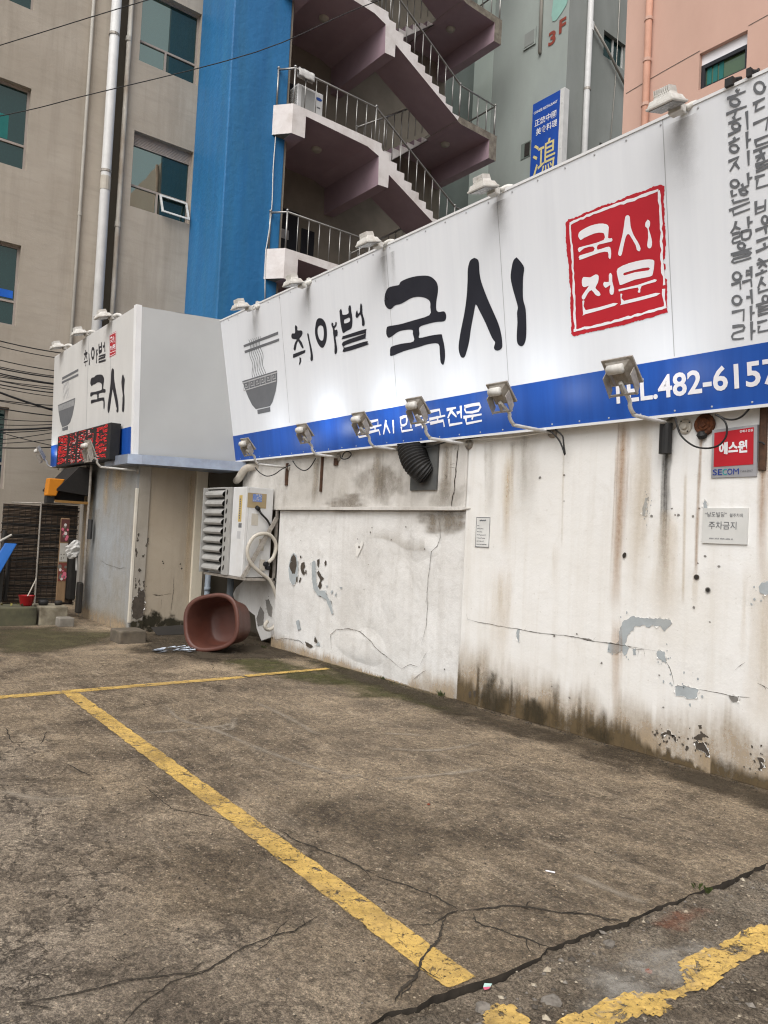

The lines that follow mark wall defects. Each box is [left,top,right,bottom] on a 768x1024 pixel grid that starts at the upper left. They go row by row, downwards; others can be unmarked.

flaking render [131,533,149,620]
peeling [288,553,342,614]
crack [330,444,459,680]
leakage [76,607,768,807]
peeling [600,611,703,707]
flaking render [652,724,710,757]